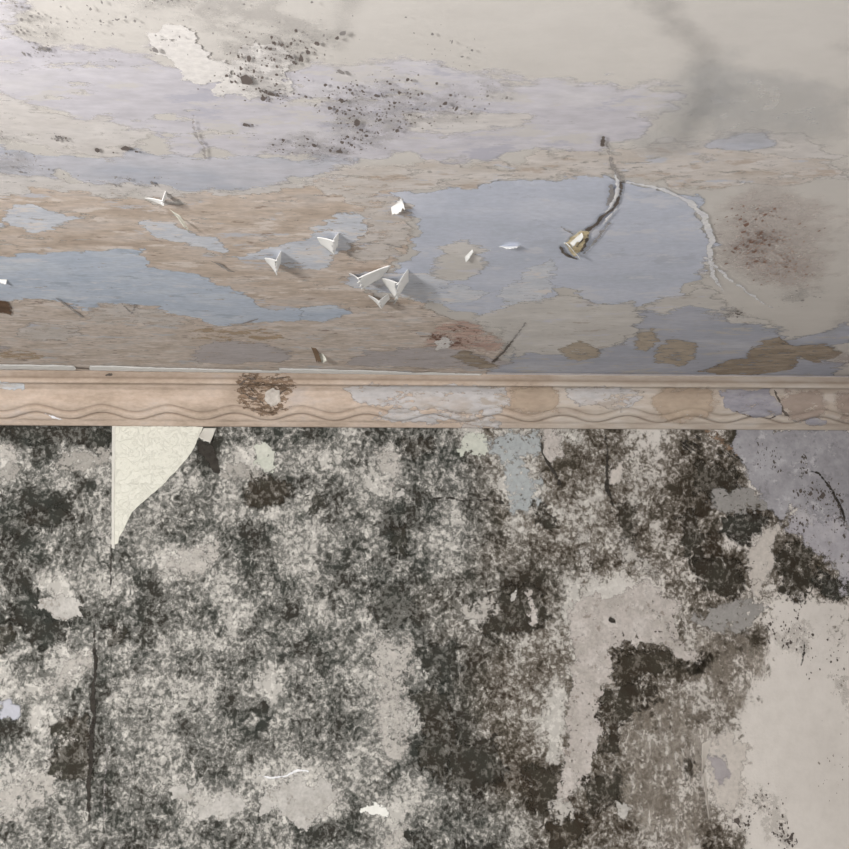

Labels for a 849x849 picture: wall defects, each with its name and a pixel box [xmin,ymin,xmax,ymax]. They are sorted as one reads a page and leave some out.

damp [210,15,493,160]
peeling [0,0,849,515]
crack [559,136,623,259]
damp [714,205,822,307]
crack [107,545,115,585]
peeling [691,417,849,634]
crack [812,471,849,528]
crack [86,613,108,821]